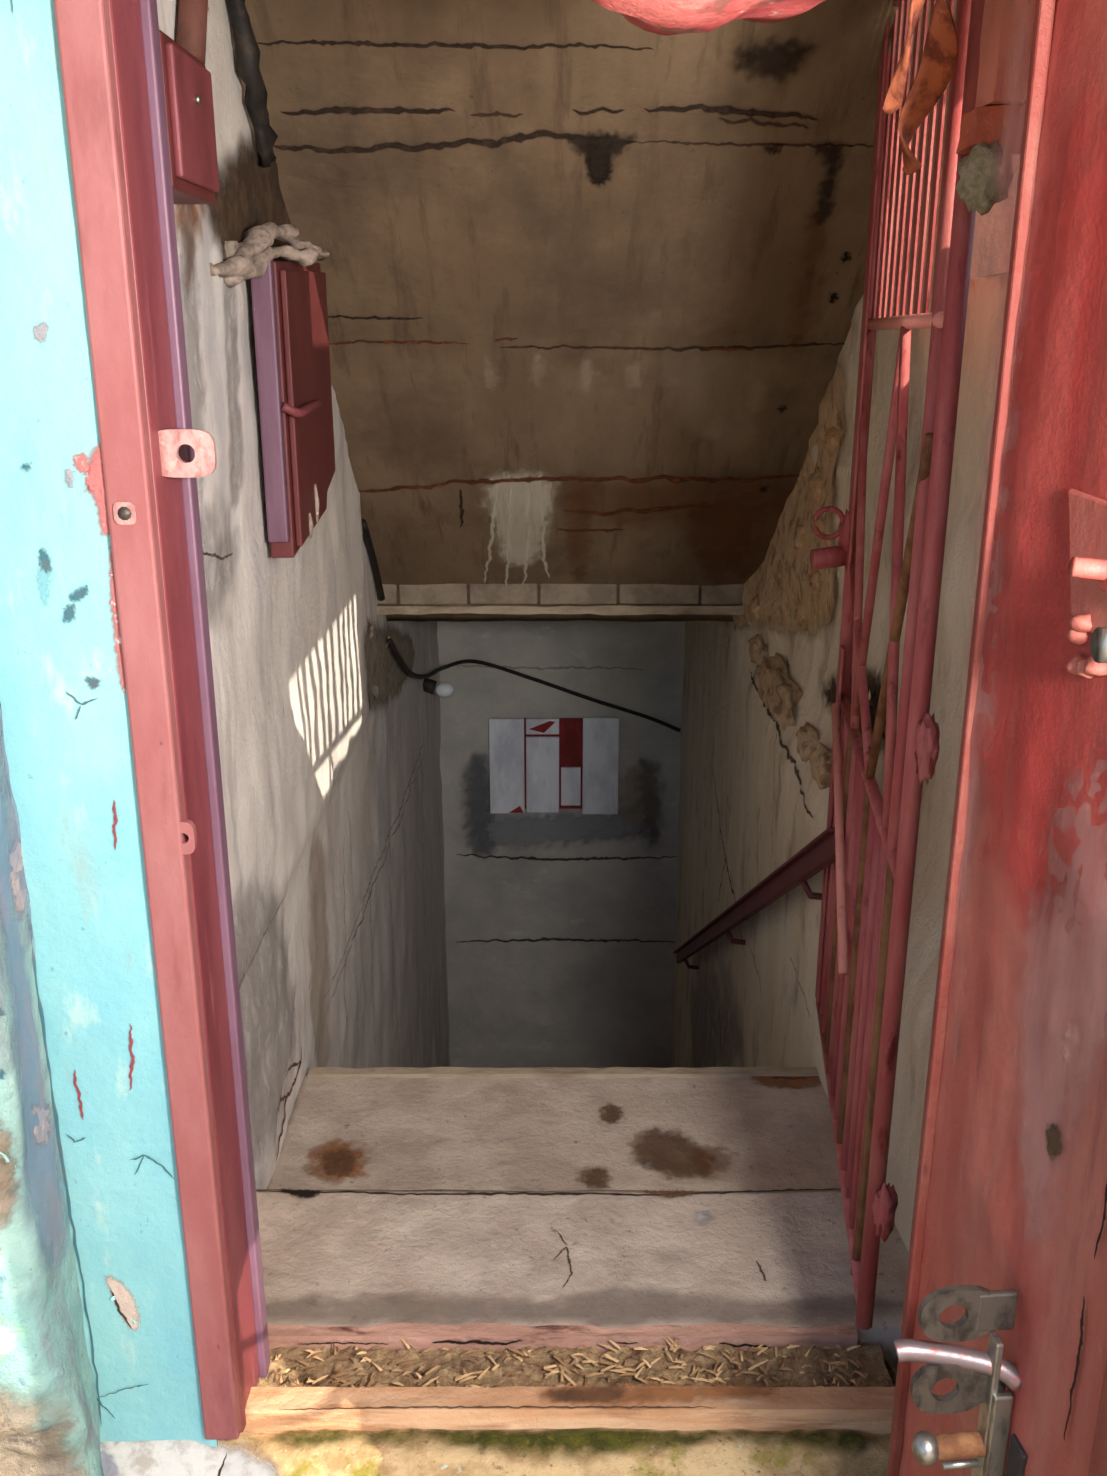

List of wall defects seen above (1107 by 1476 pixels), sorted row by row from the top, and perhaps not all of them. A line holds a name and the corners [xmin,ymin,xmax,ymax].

crack [257,39,654,50]
crack [274,104,874,185]
damp [814,146,842,224]
peeling [39,549,51,572]
damp [484,475,551,586]
spalling [725,365,845,633]
crack [749,670,813,852]
peeling [0,701,64,1261]
damp [309,1142,364,1181]
damp [632,1128,714,1177]